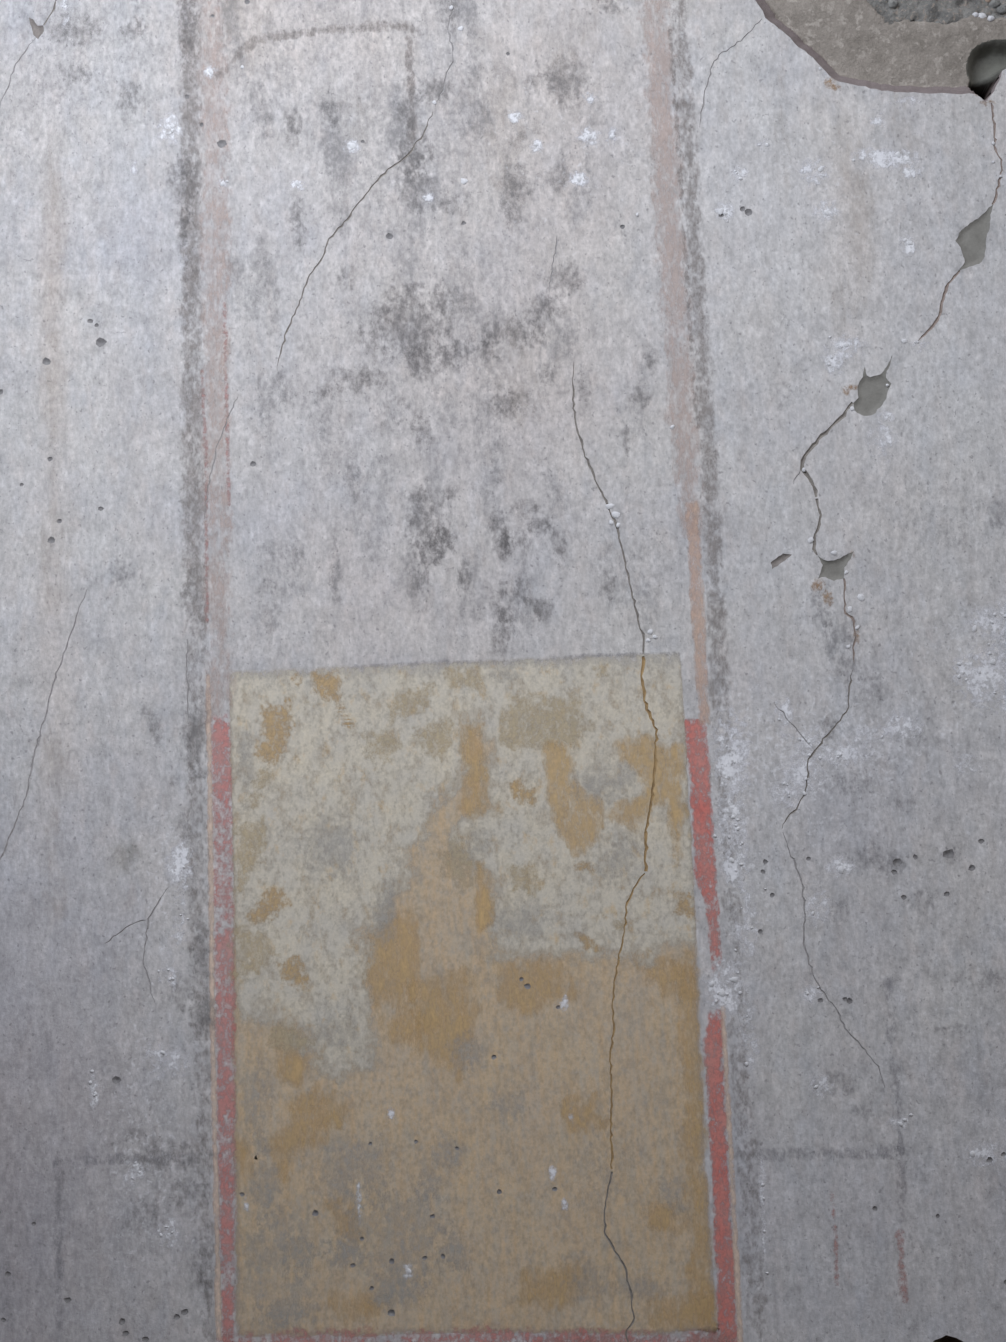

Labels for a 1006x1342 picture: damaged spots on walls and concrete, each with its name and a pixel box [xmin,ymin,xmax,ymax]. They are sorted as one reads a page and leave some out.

crack [0,0,57,106]
spalling [755,0,1006,102]
crack [277,0,464,366]
crack [549,237,558,292]
peeling [715,203,752,222]
peeling [852,148,921,179]
crack [901,271,960,343]
crack [991,103,1003,205]
crack [204,397,238,519]
peeling [952,603,1006,710]
crack [774,402,885,1088]
crack [572,365,659,1342]